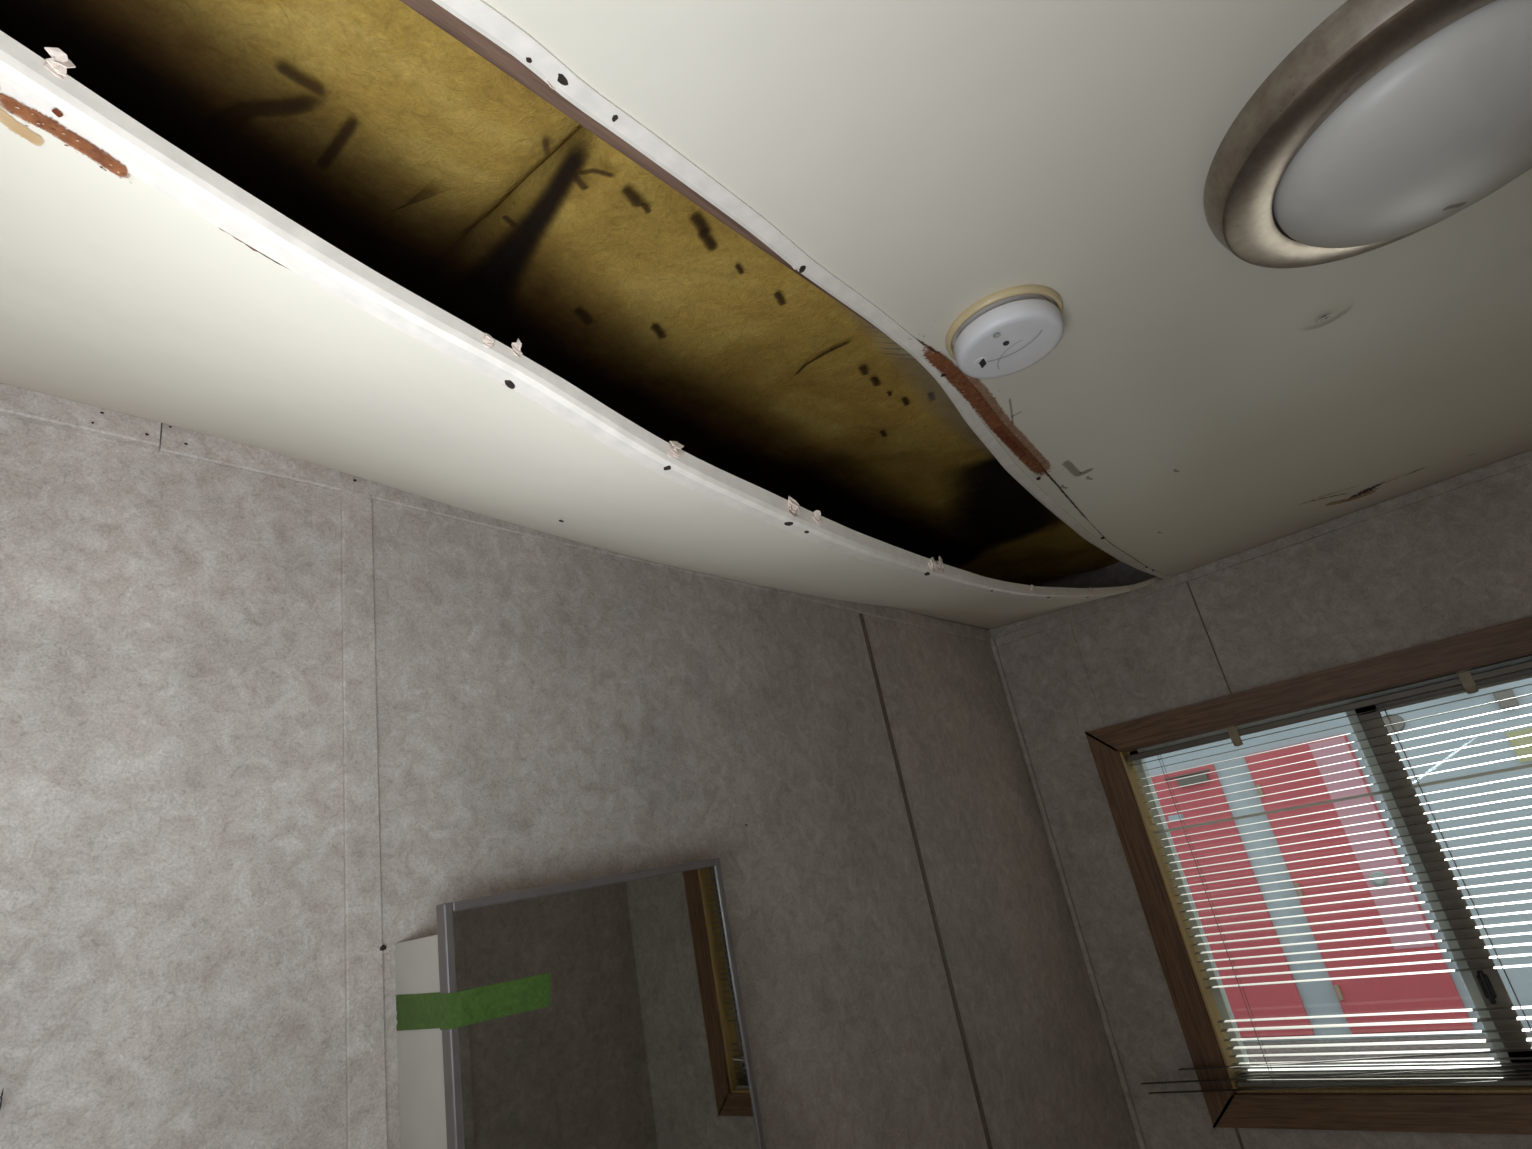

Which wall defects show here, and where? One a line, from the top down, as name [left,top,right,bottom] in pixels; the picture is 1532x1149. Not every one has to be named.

peeling [0,94,132,184]
damp [0,0,1060,568]